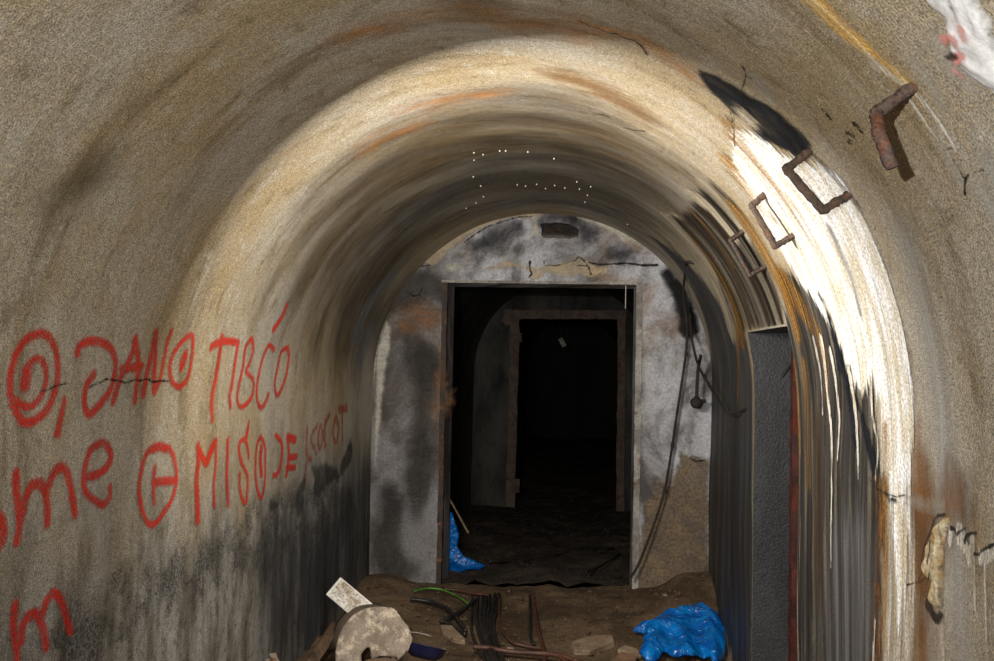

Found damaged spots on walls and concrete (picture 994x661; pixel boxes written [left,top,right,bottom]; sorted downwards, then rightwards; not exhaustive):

corrosion [805,0,908,86]
corrosion [909,93,957,157]
crack [529,258,658,277]
crack [43,378,169,391]
damp [661,121,958,661]
damp [114,443,371,653]
crack [948,523,994,643]
damp [53,605,122,661]